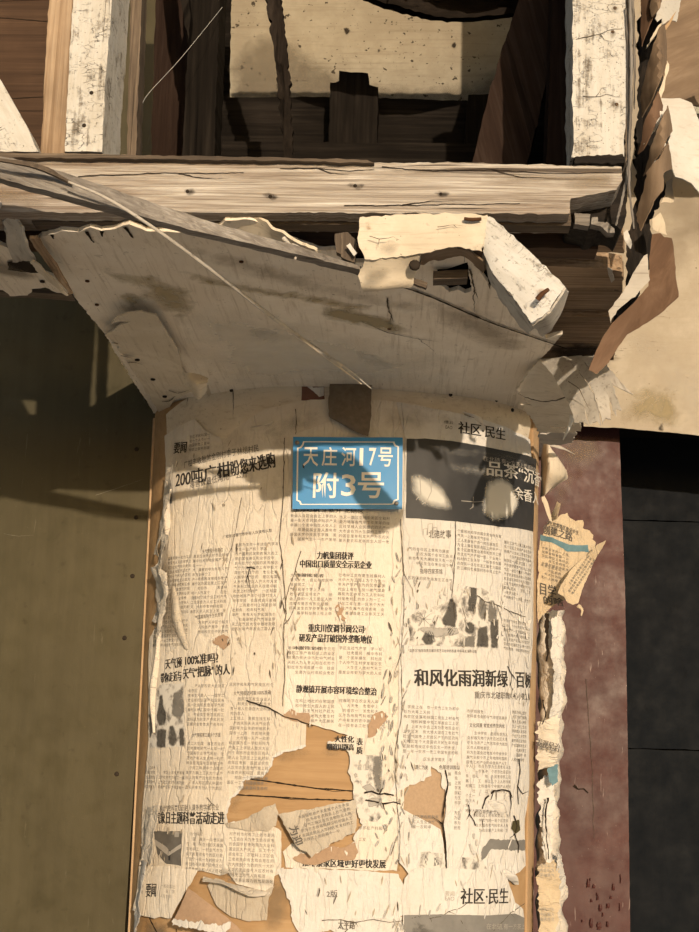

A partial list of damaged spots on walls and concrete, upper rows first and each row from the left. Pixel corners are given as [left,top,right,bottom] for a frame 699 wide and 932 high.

peeling [636,0,676,235]
spalling [7,261,38,273]
crack [393,519,414,692]
crack [237,714,402,859]
peeling [403,767,446,835]
peeling [581,874,621,930]